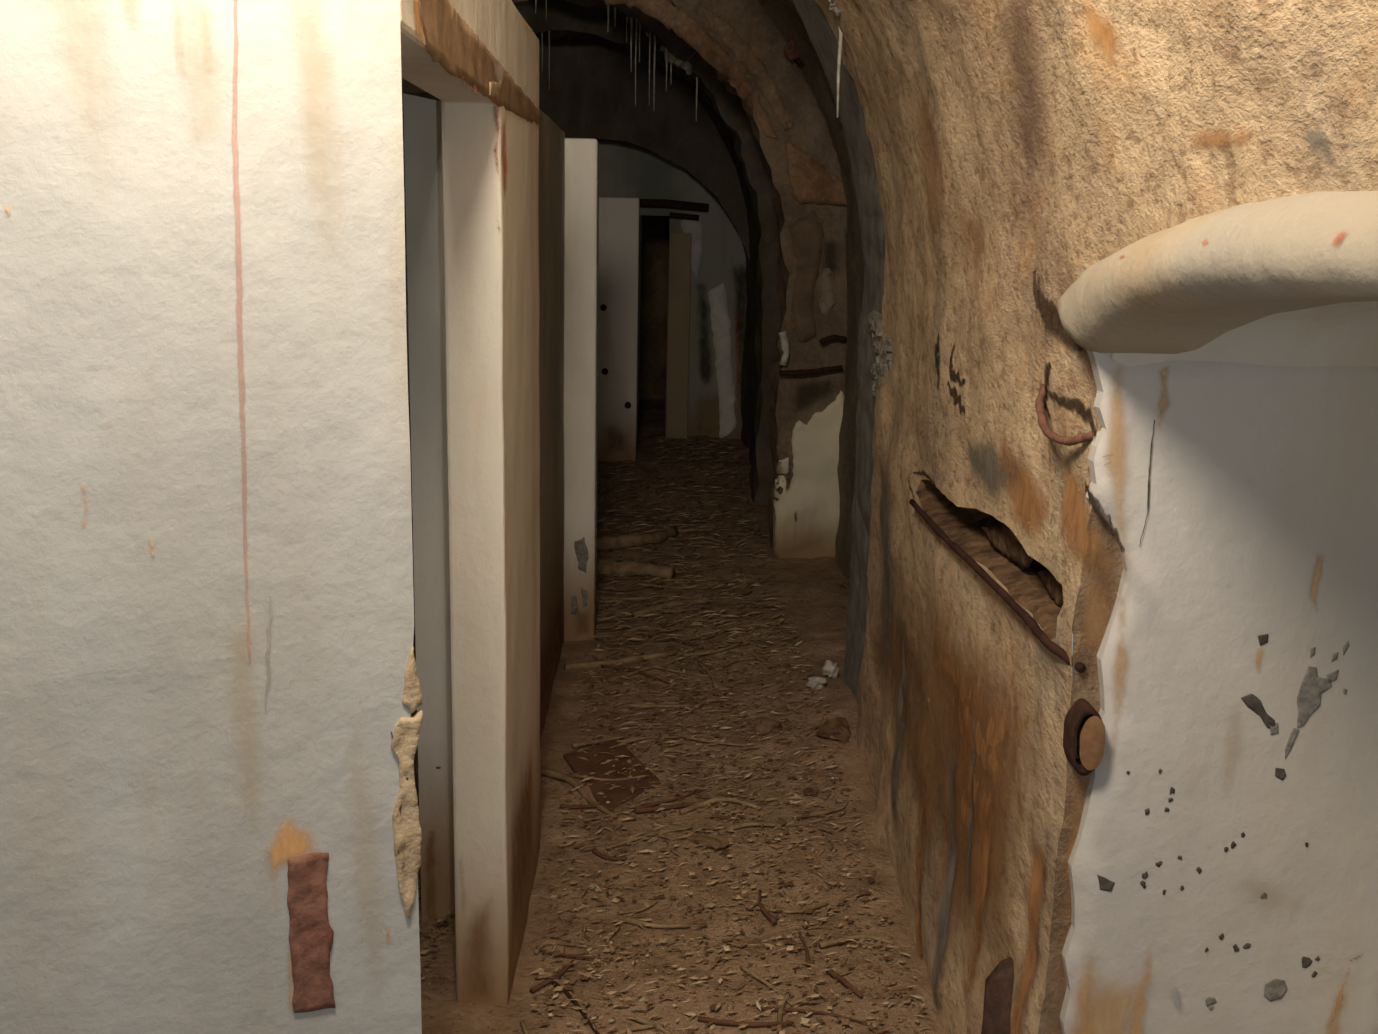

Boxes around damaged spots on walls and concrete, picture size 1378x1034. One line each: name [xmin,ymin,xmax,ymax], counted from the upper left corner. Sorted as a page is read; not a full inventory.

flaking render [774,391,844,559]
spalling [909,479,1086,673]
water stain [880,484,906,818]
peeling [1241,641,1349,781]
rust [272,824,309,866]
spalling [391,647,423,919]
water stain [931,726,975,1007]
peeling [1097,875,1115,892]
peeling [1140,855,1182,889]
peeling [1205,933,1251,953]
peeling [1264,979,1288,1002]
peeling [1302,956,1320,978]